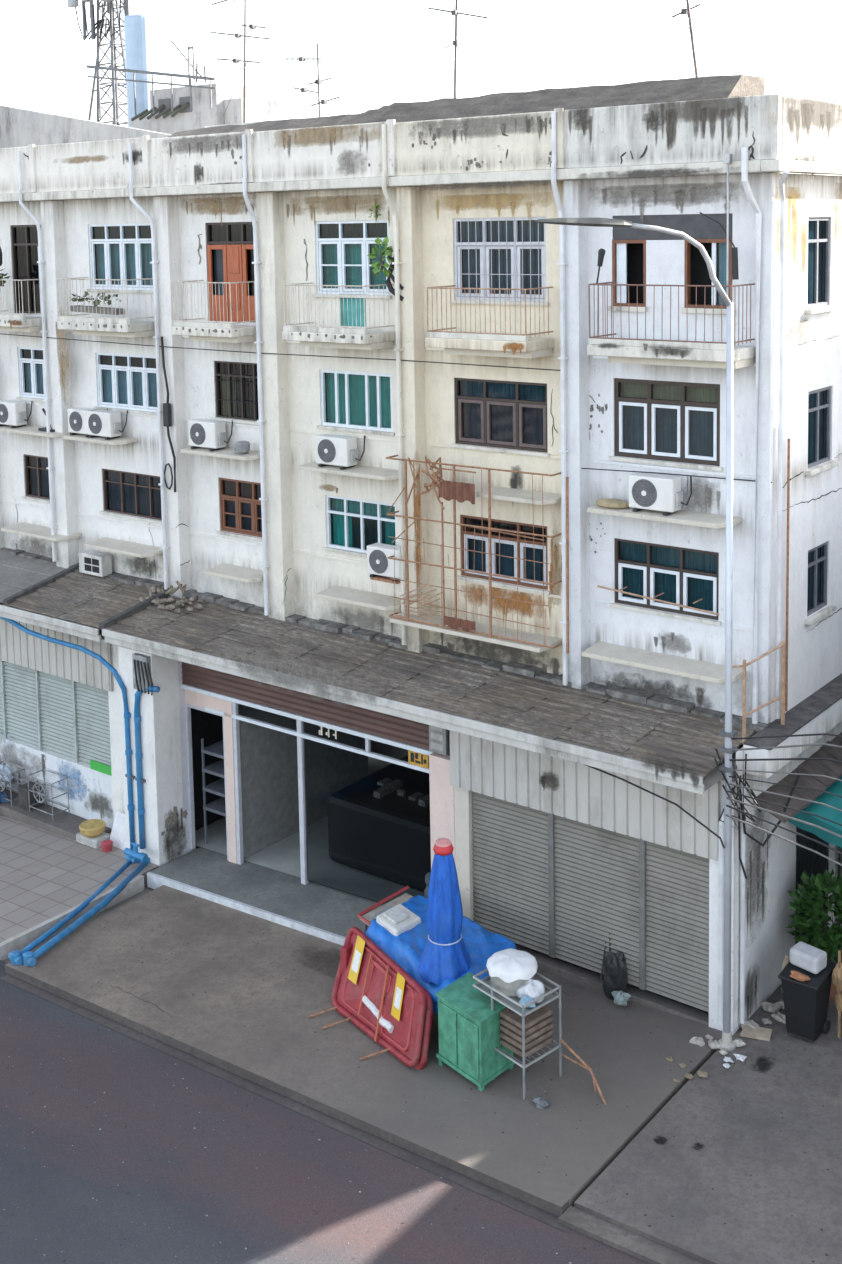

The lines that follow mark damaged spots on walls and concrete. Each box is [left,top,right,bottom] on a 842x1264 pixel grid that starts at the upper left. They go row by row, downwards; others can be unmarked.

leakage [419,116,547,144]
leakage [568,107,592,142]
leakage [646,96,748,147]
leakage [773,97,842,182]
leakage [170,135,254,225]
corrosion [503,343,523,354]
leakage [510,467,522,489]
corrosion [466,539,561,621]
corrosion [444,616,476,632]
leakage [654,633,688,651]
leakage [540,773,558,790]
leakage [165,809,184,862]